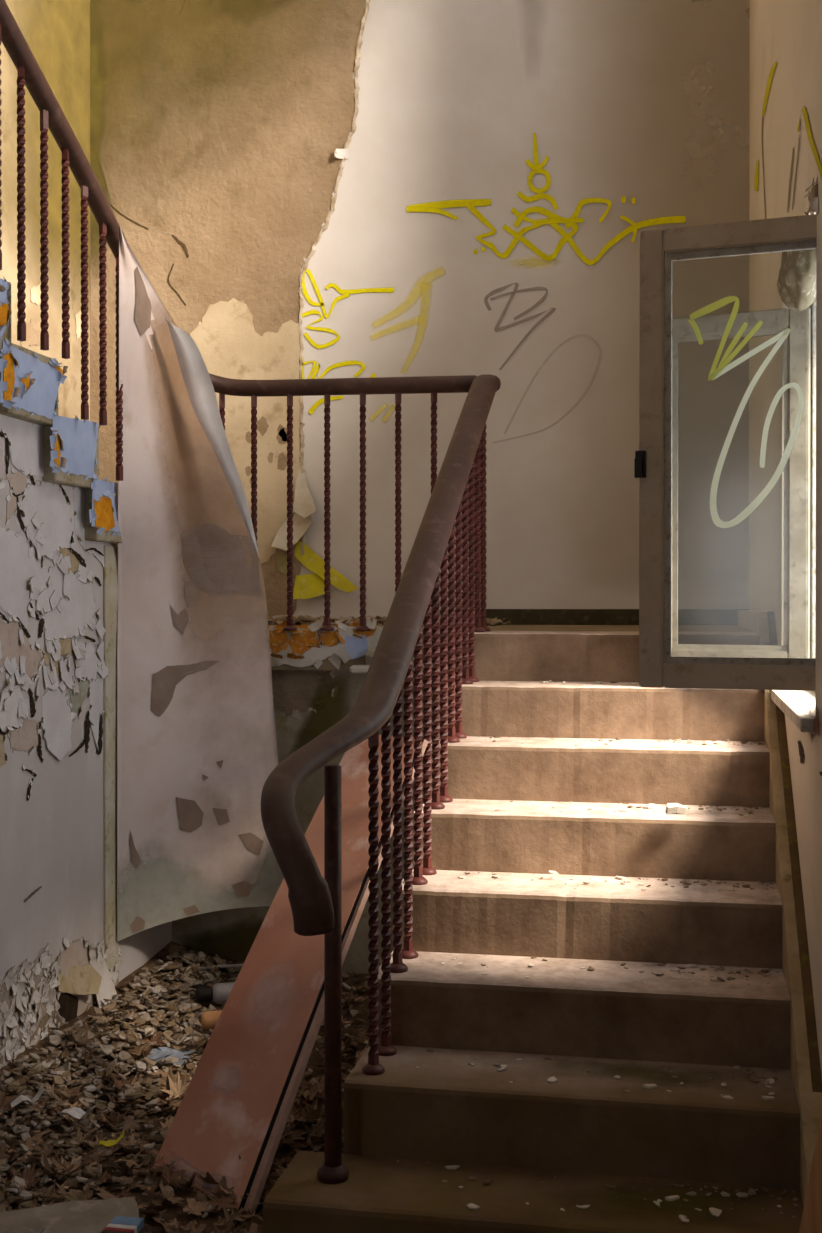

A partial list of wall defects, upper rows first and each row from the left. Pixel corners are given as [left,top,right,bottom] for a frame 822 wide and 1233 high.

peeling [0,0,383,1069]